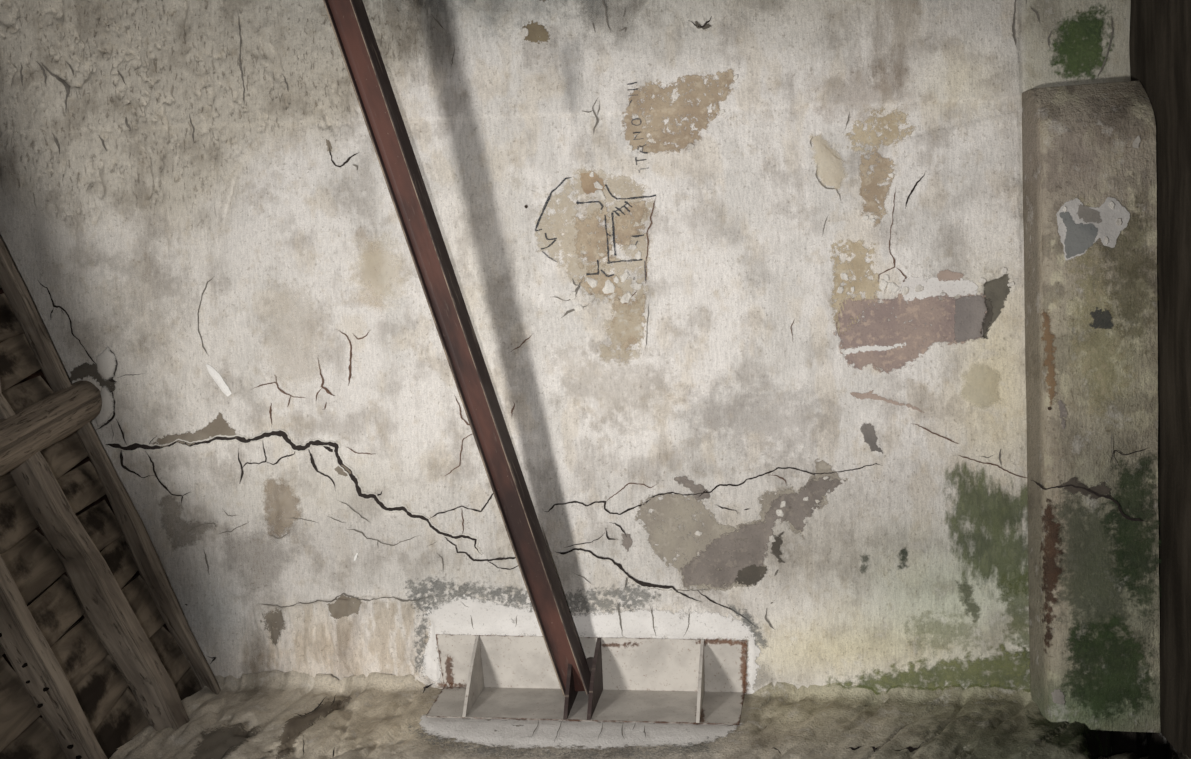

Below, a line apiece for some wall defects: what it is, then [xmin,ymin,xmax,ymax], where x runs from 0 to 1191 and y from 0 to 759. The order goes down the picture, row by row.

crack [1012,0,1051,48]
spalling [622,69,738,153]
spalling [535,169,653,363]
peeling [830,240,987,373]
peeling [1056,197,1130,260]
spalling [153,412,236,447]
crack [39,278,517,575]
crack [263,593,417,608]
crack [545,463,882,636]
spalling [635,459,847,591]
crack [915,424,1147,522]
corrosion [1040,499,1063,653]